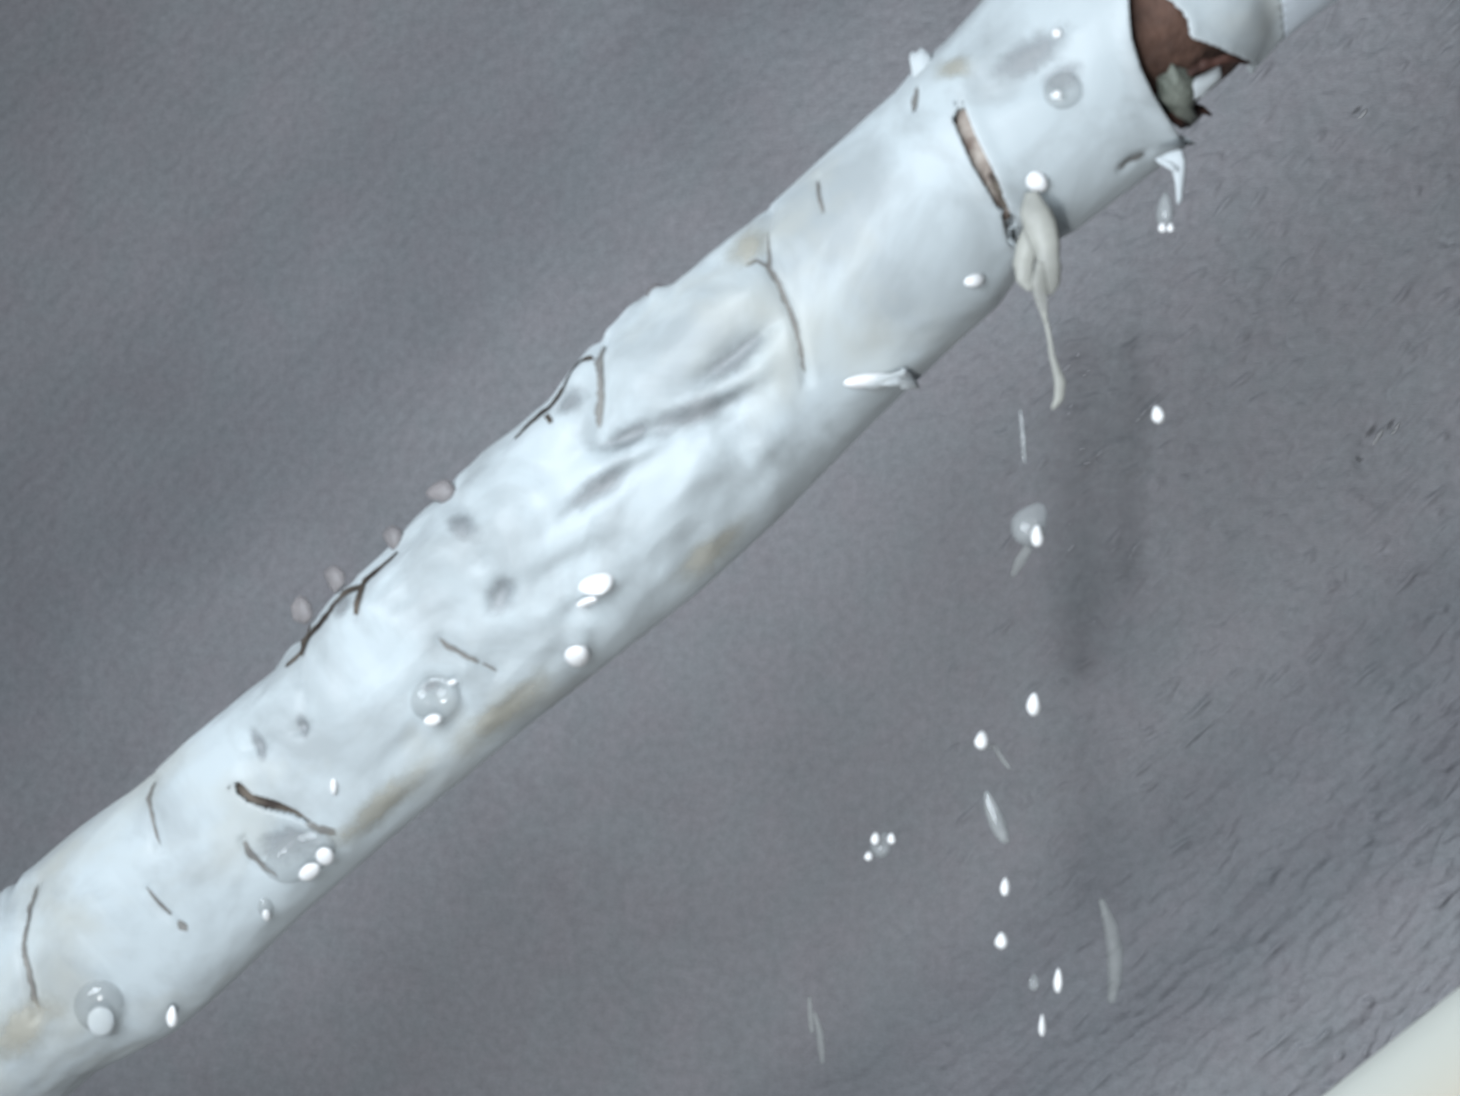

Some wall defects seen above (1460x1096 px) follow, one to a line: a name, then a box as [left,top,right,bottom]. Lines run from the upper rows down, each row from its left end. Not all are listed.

crack [910,88,918,112]
crack [956,108,1010,233]